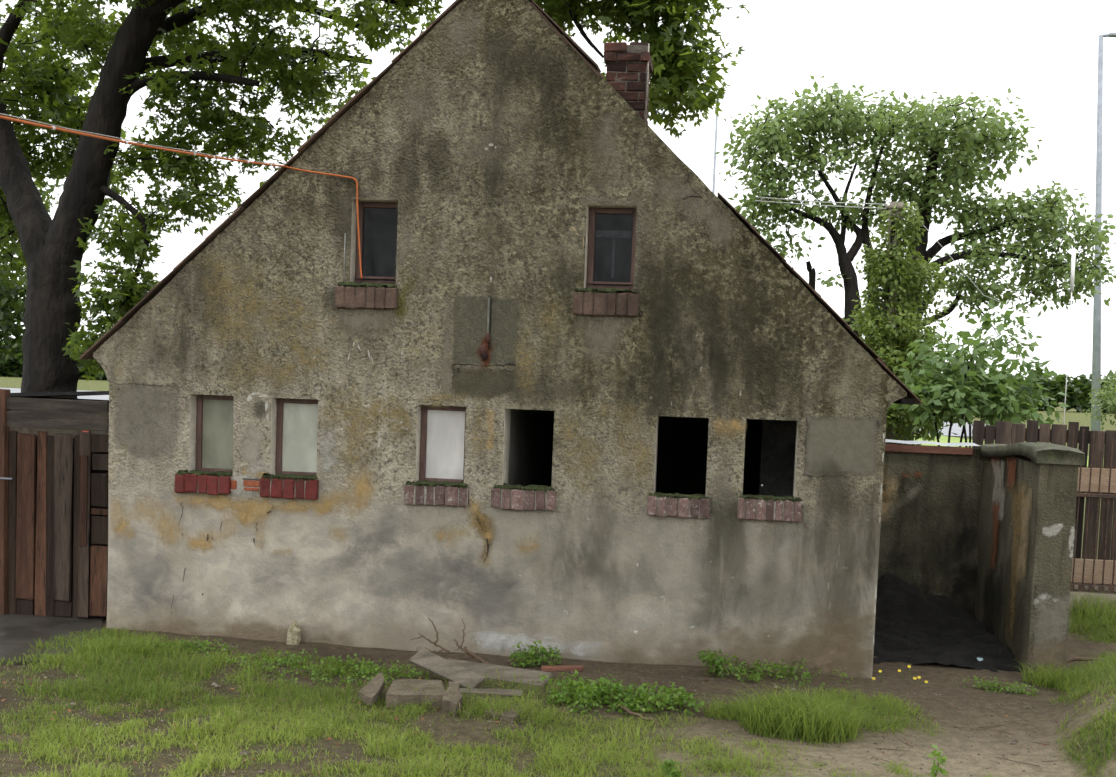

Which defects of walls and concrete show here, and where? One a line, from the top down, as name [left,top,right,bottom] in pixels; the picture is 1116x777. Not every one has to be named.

spalling [1043,524,1075,558]
water stain [714,564,871,678]